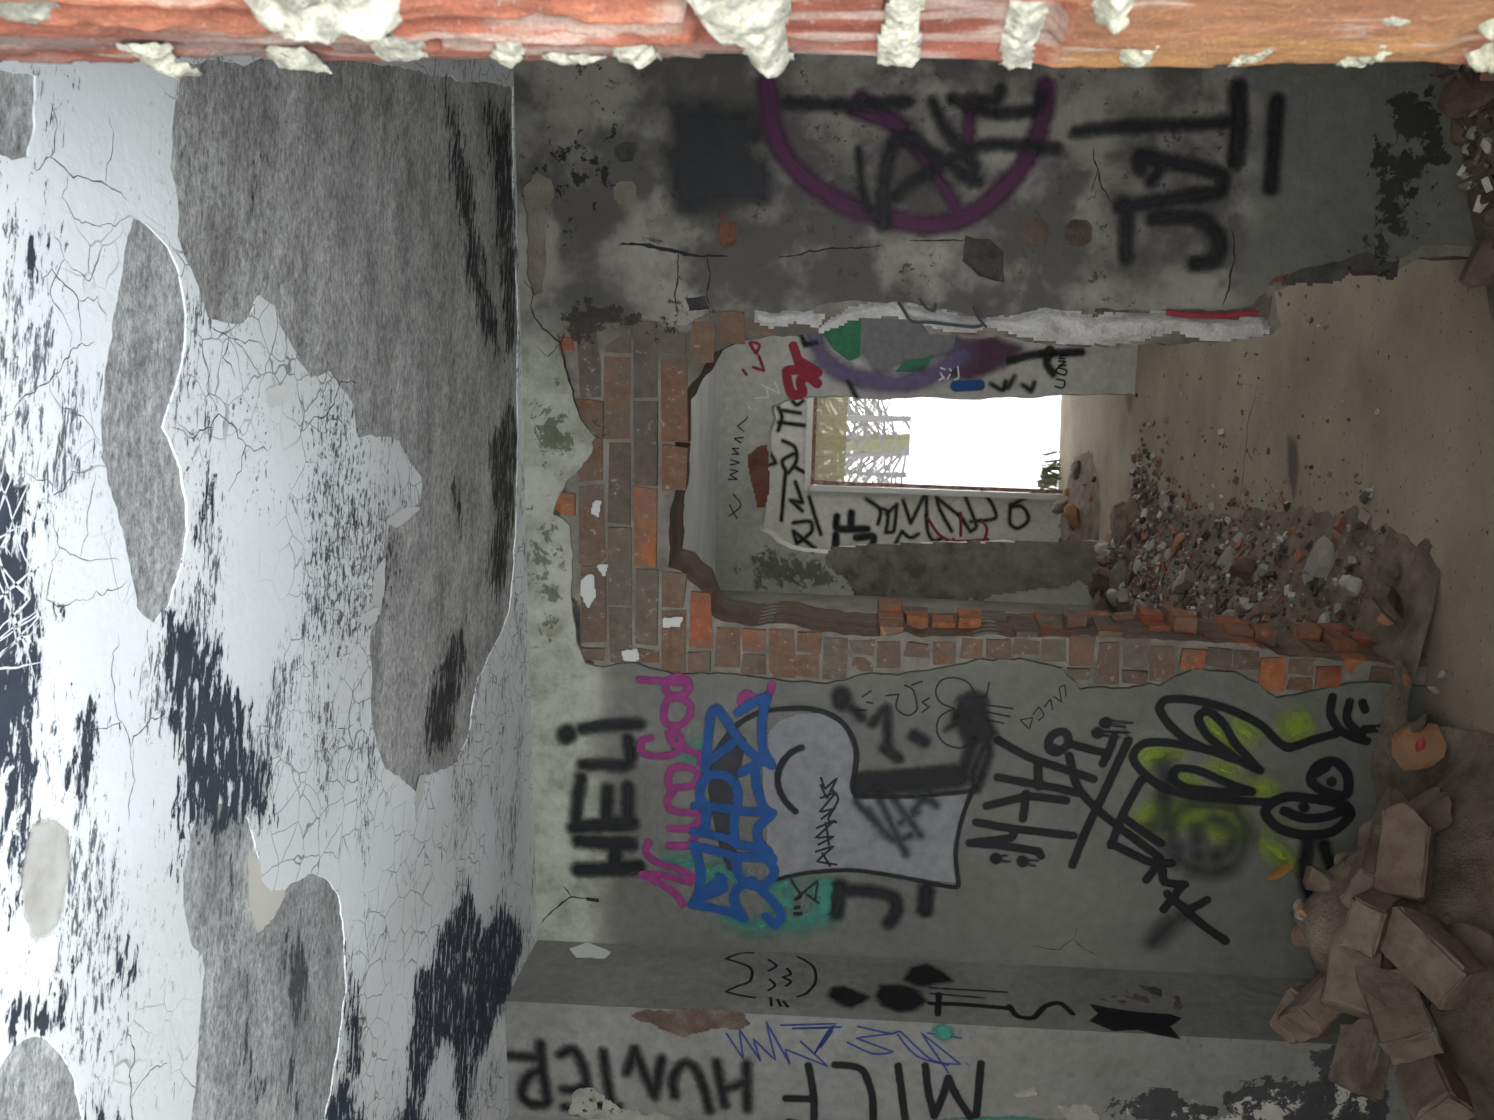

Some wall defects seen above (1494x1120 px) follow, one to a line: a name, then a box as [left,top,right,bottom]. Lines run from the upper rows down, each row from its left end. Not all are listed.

spalling [962,236,1004,282]
crack [4,103,128,607]
crack [172,327,268,490]
peeling [101,58,554,821]
crack [301,363,356,450]
flaking render [554,251,1427,692]
crack [78,636,166,822]
crack [328,685,355,778]
peeling [183,803,346,1120]
peeling [0,1037,82,1120]
crack [127,1028,168,1120]
spalling [1057,1044,1400,1120]